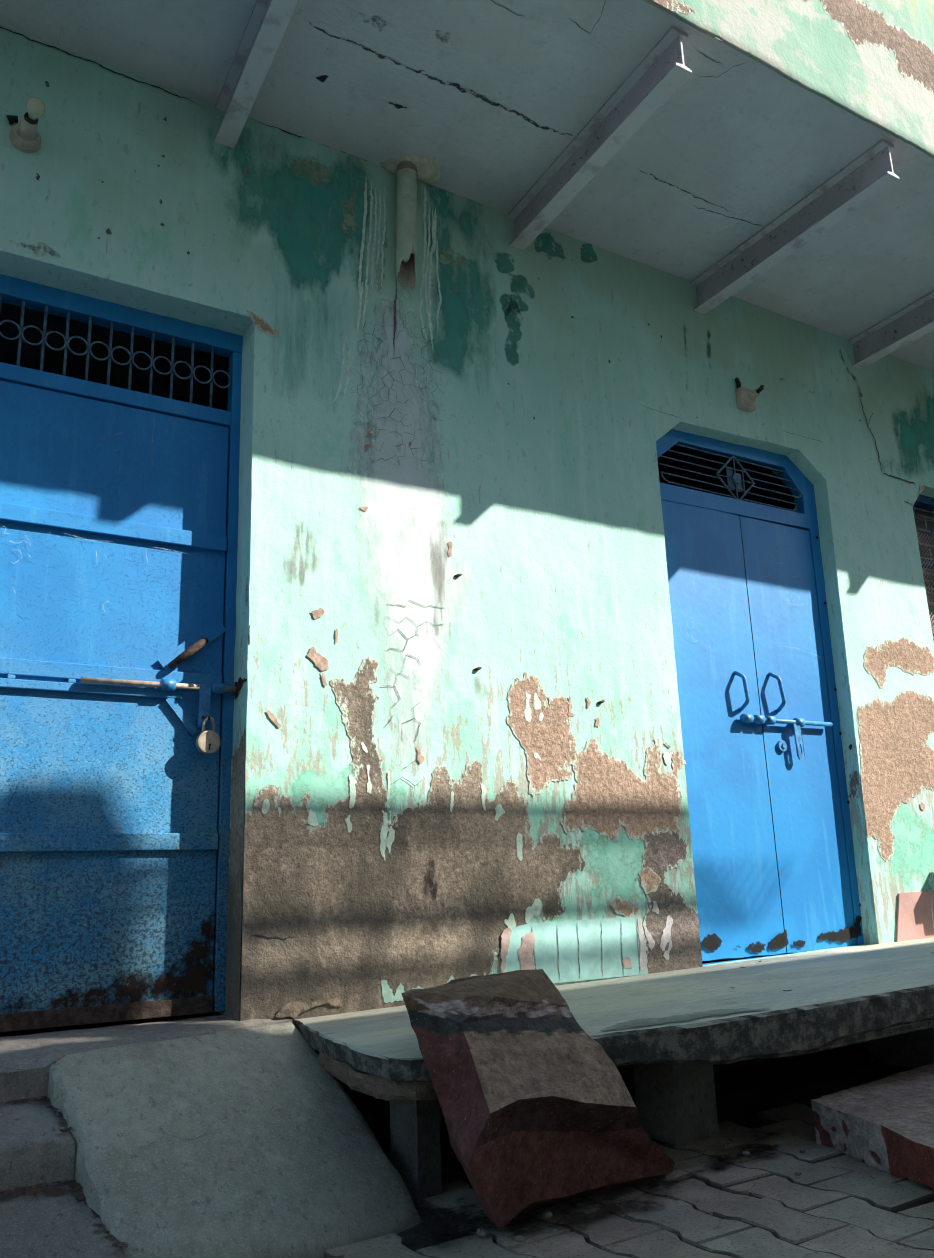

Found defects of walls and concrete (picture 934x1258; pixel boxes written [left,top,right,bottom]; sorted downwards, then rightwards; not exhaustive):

crack [308,21,573,136]
peeling [653,0,696,15]
peeling [803,0,934,94]
flaking render [247,310,281,337]
crack [351,278,445,467]
crack [860,399,916,487]
corrosion [234,677,247,699]
peeling [848,637,934,862]
peeling [224,646,722,1025]
corrosion [50,913,216,1008]
peeling [736,915,862,952]